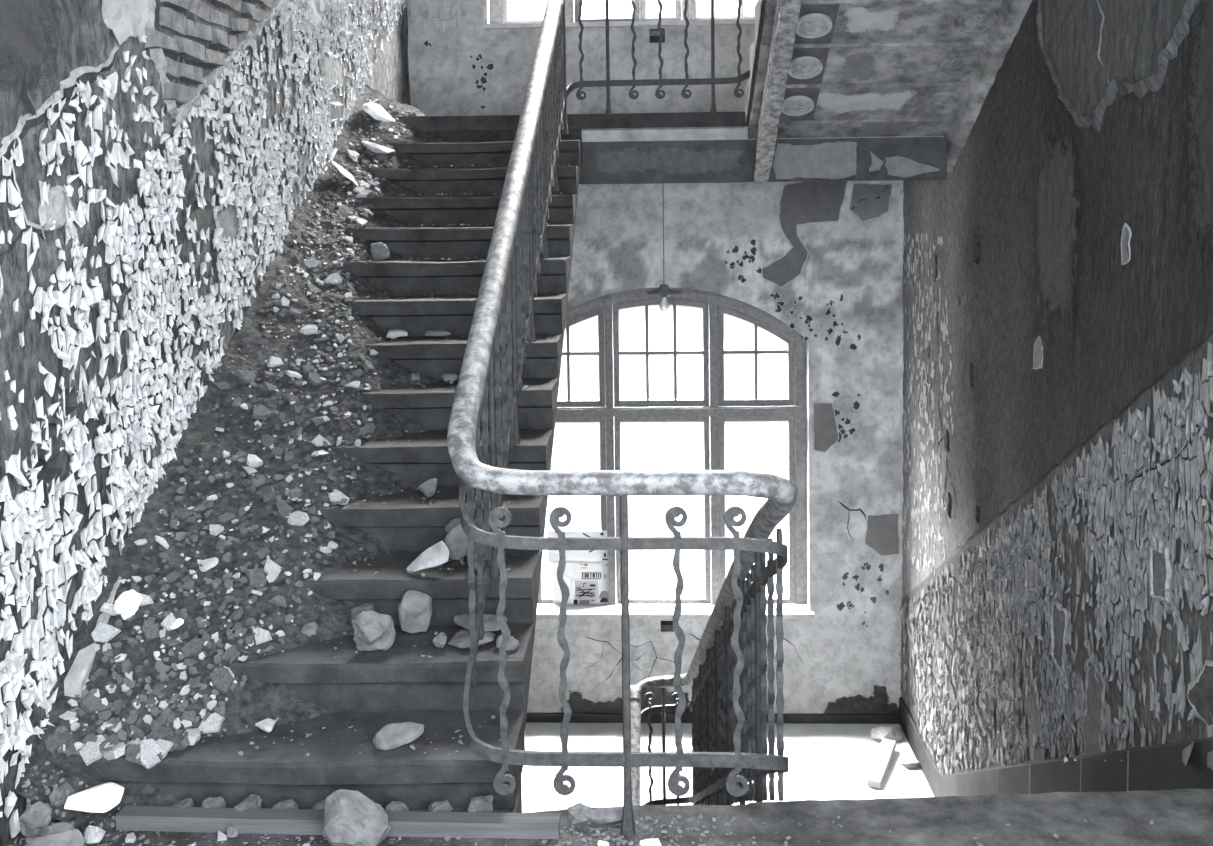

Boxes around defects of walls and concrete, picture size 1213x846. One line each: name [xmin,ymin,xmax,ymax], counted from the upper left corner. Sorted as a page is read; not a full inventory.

peeling [0,0,467,838]
flaking render [724,139,943,351]
peeling [836,223,1213,775]
crack [1096,0,1109,85]